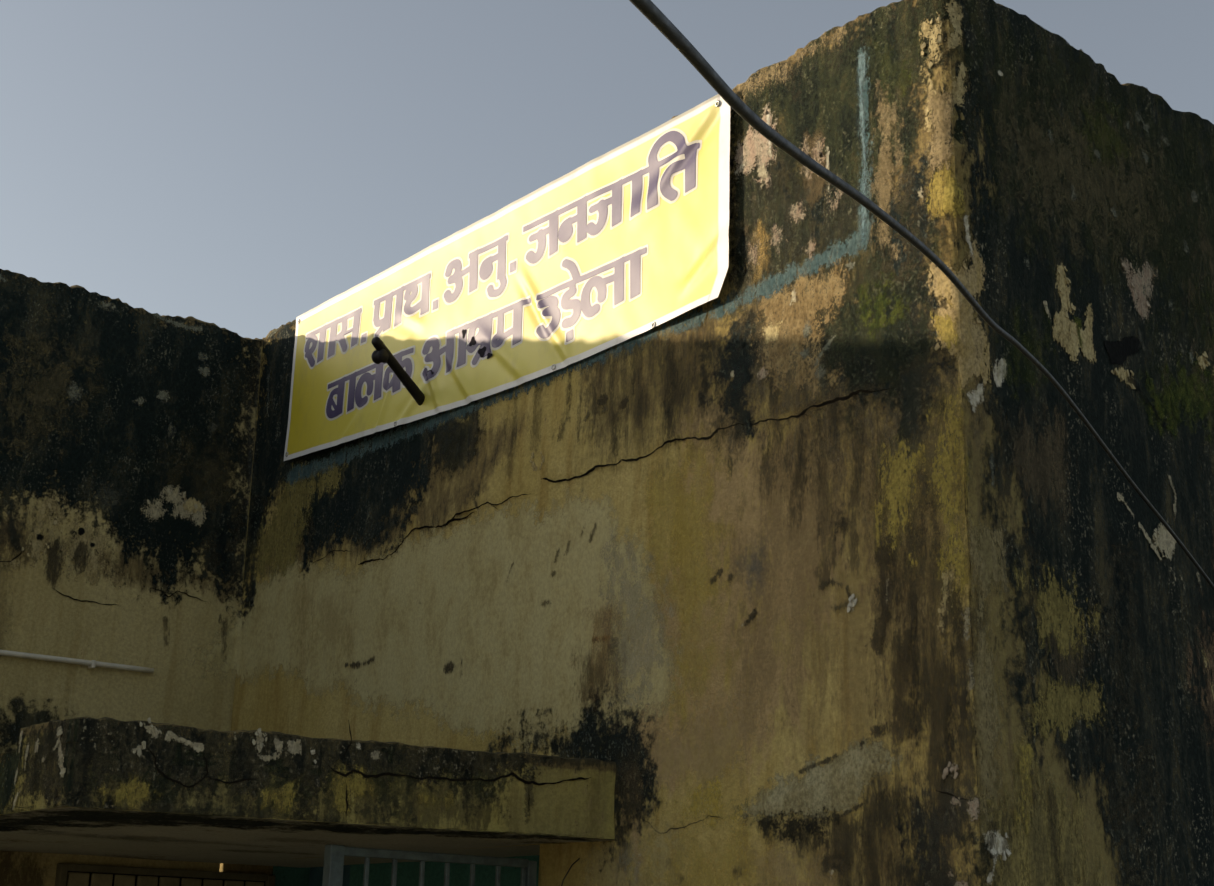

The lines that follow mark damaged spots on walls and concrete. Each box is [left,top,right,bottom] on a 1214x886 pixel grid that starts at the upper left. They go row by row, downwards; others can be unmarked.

peeling [732,26,847,189]
peeling [140,485,208,527]
water stain [0,269,486,660]
crack [313,388,893,565]
water stain [699,0,1214,886]
peeling [1043,257,1165,427]
peeling [1189,351,1214,375]
peeling [133,717,204,757]
crack [148,748,258,788]
water stain [0,677,660,872]